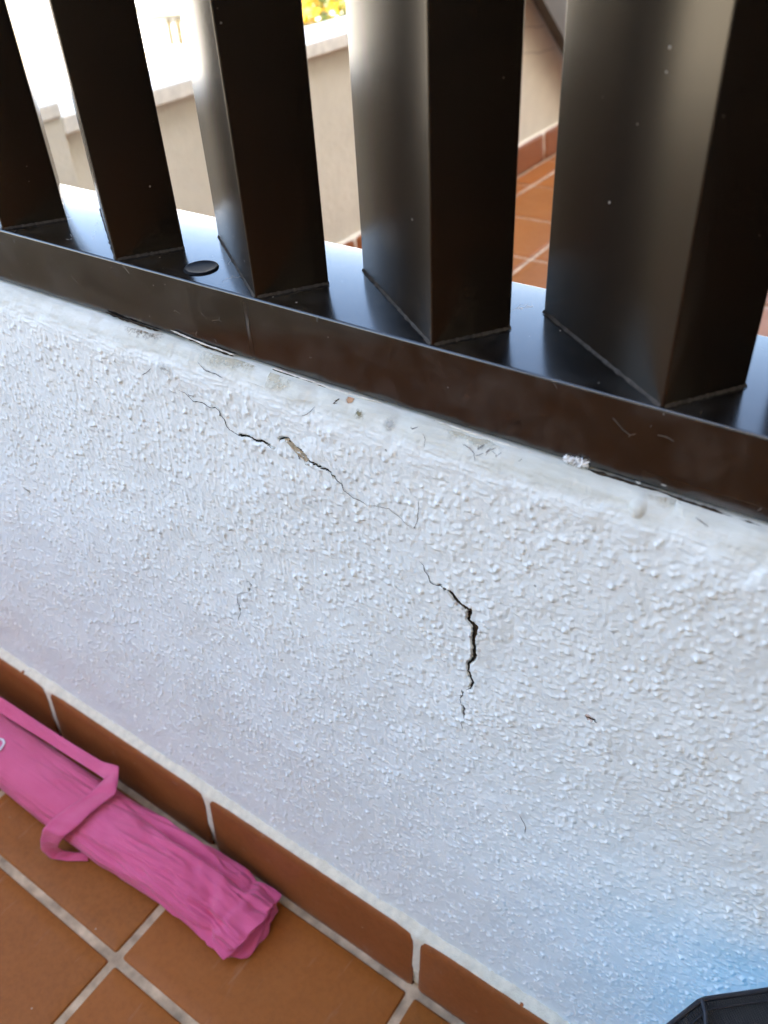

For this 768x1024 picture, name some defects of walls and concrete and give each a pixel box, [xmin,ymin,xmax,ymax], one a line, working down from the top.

crack [168,389,419,528]
crack [419,561,482,728]